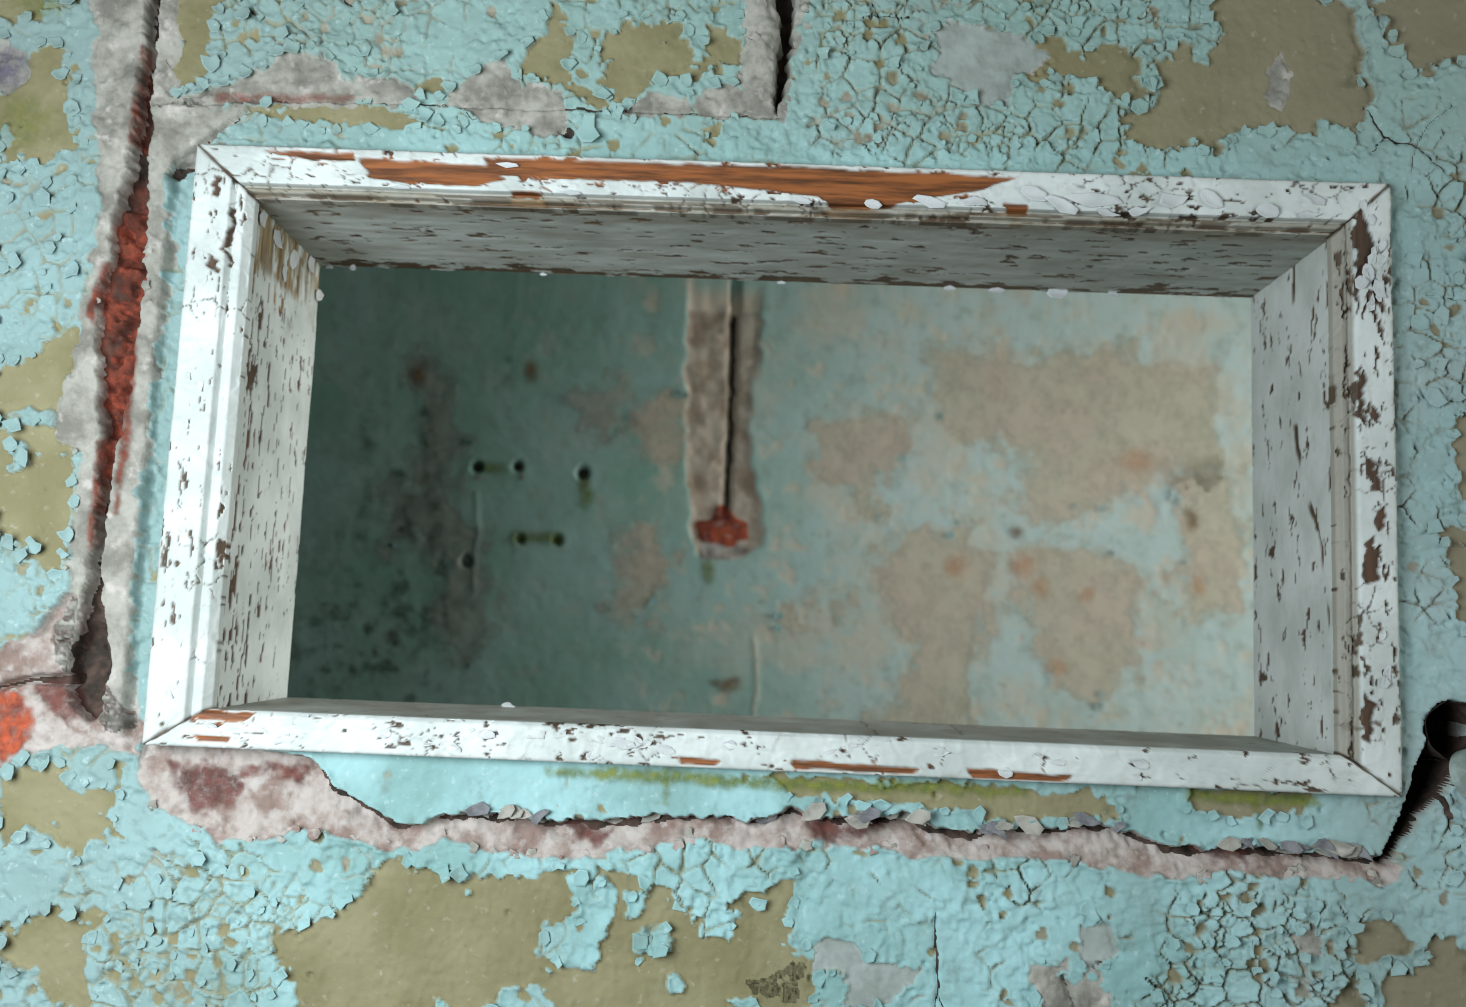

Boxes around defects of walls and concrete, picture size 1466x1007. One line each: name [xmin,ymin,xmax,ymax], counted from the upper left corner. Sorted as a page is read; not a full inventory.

corrosion [131,47,153,154]
peeling [170,0,749,142]
peeling [801,0,1466,165]
peeling [864,199,882,209]
peeling [912,194,987,208]
peeling [1045,192,1152,217]
peeling [1256,202,1279,218]
peeling [0,0,89,582]
corrosion [87,211,149,542]
peeling [1355,199,1466,636]
peeling [0,593,1466,1007]
crack [1373,758,1454,861]